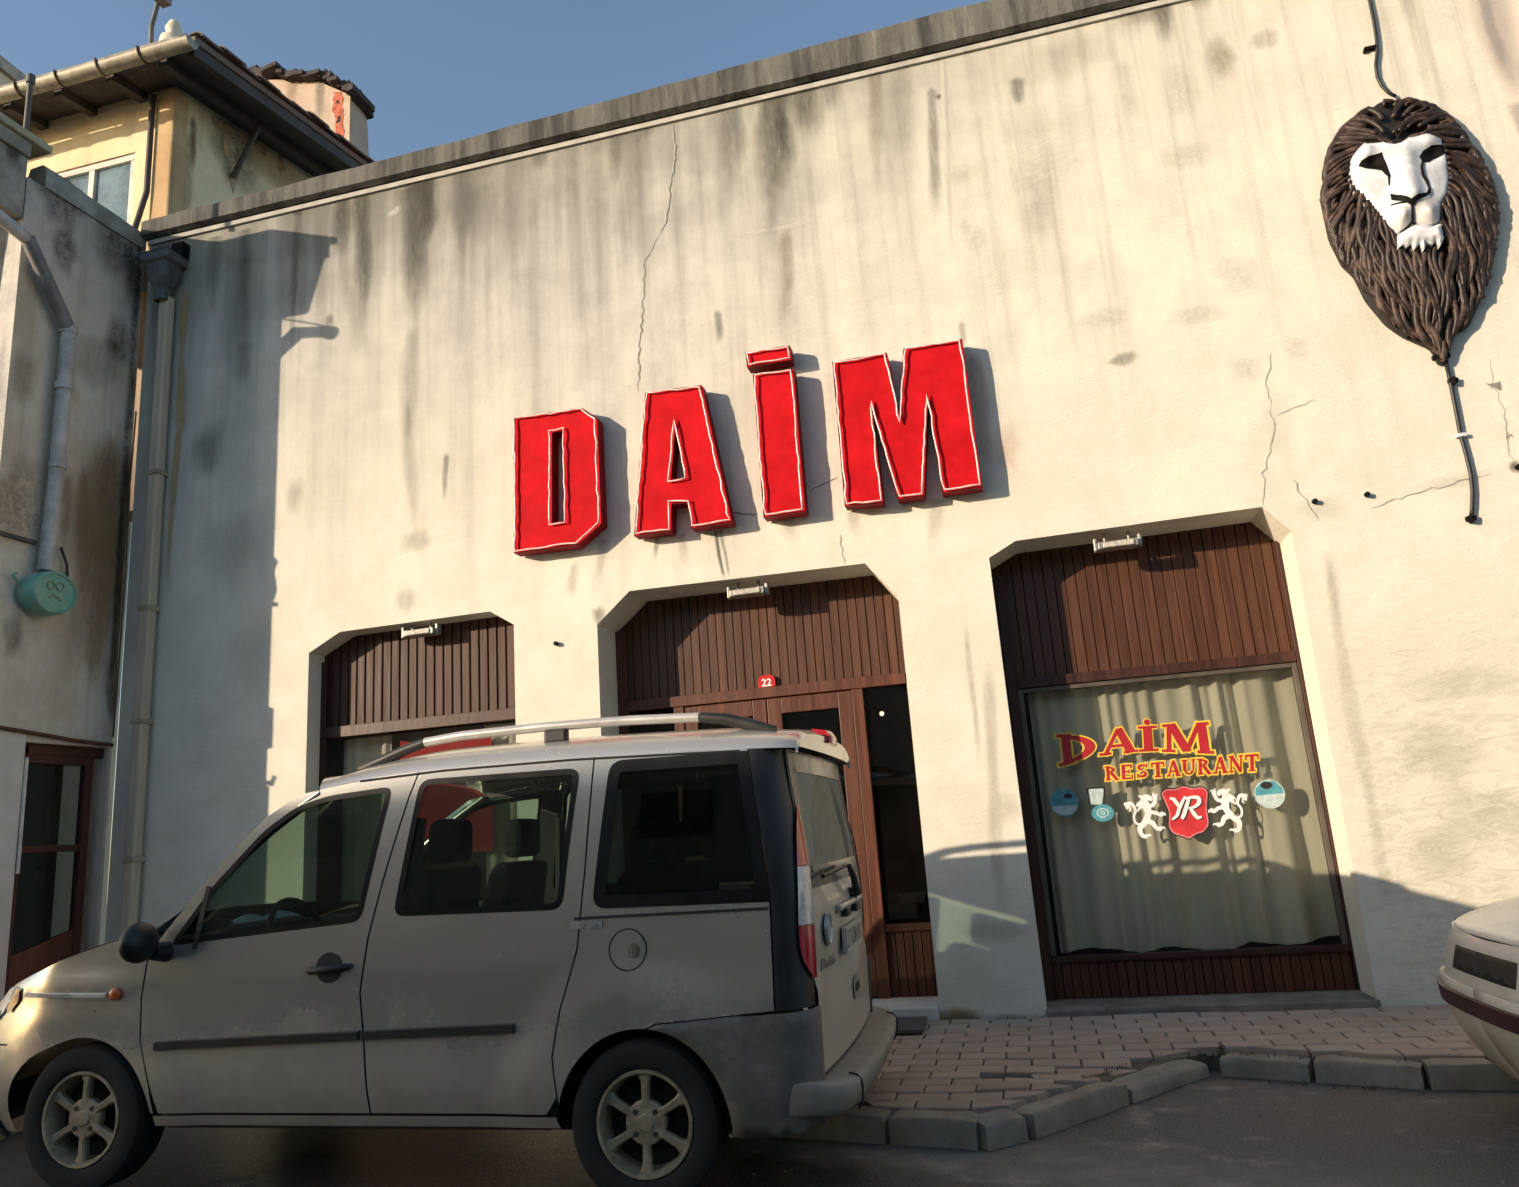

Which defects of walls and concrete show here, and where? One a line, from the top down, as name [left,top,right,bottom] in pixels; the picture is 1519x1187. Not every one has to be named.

water stain [763,81,813,176]
crack [637,122,676,384]
crack [1261,353,1318,520]
crack [1372,363,1515,508]